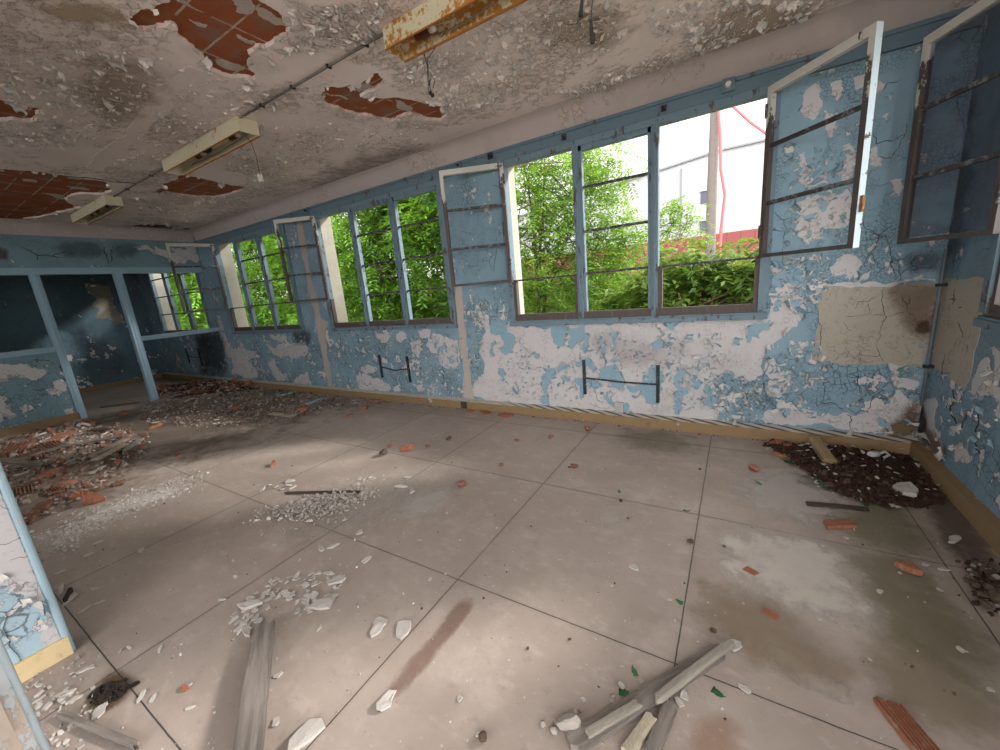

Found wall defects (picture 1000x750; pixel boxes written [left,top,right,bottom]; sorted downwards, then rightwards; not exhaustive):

spalling [0,0,386,166]
spalling [322,0,835,121]
peeling [798,68,865,120]
spalling [0,169,110,219]
spalling [156,175,244,201]
peeling [217,315,322,385]
peeling [328,121,1000,463]
crack [802,228,935,427]
peeling [0,494,60,649]